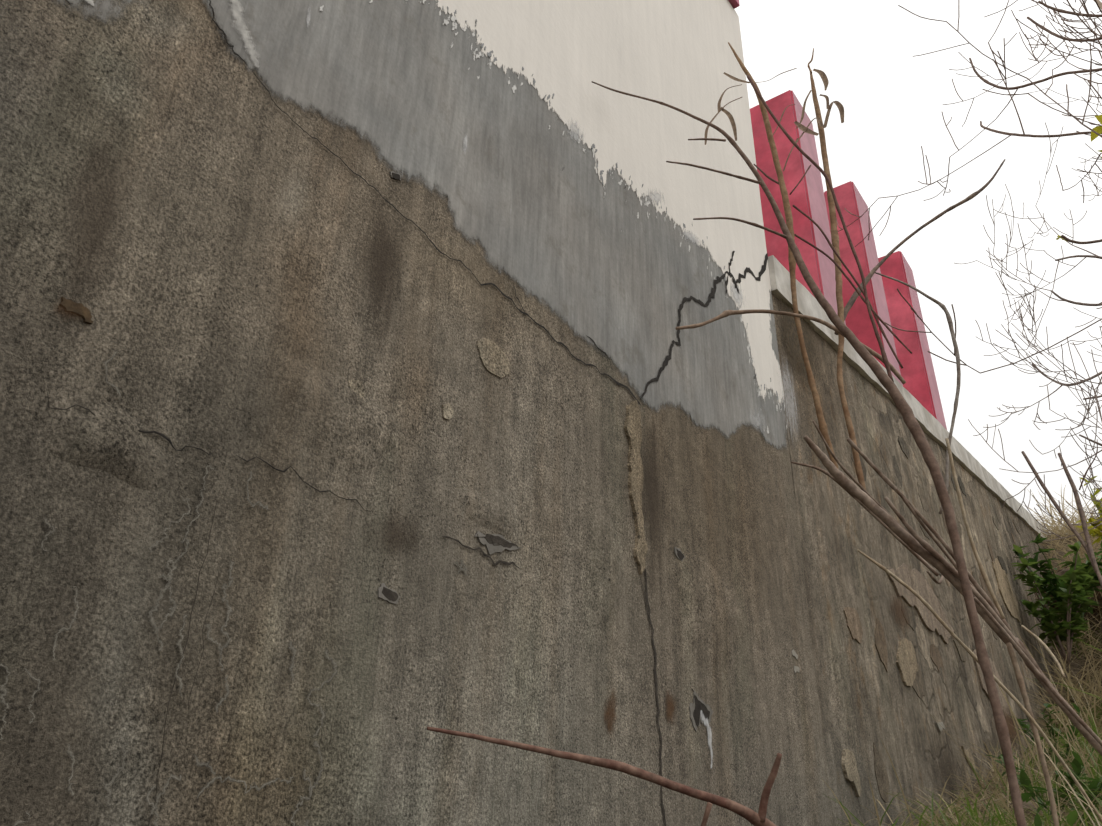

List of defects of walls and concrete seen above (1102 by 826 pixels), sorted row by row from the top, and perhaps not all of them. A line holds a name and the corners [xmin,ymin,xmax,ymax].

peeling [439,6,497,79]
crack [209,0,768,405]
peeling [563,129,726,282]
flaking render [477,338,510,378]
crack [47,392,96,416]
crack [138,430,371,512]
crack [640,569,666,826]